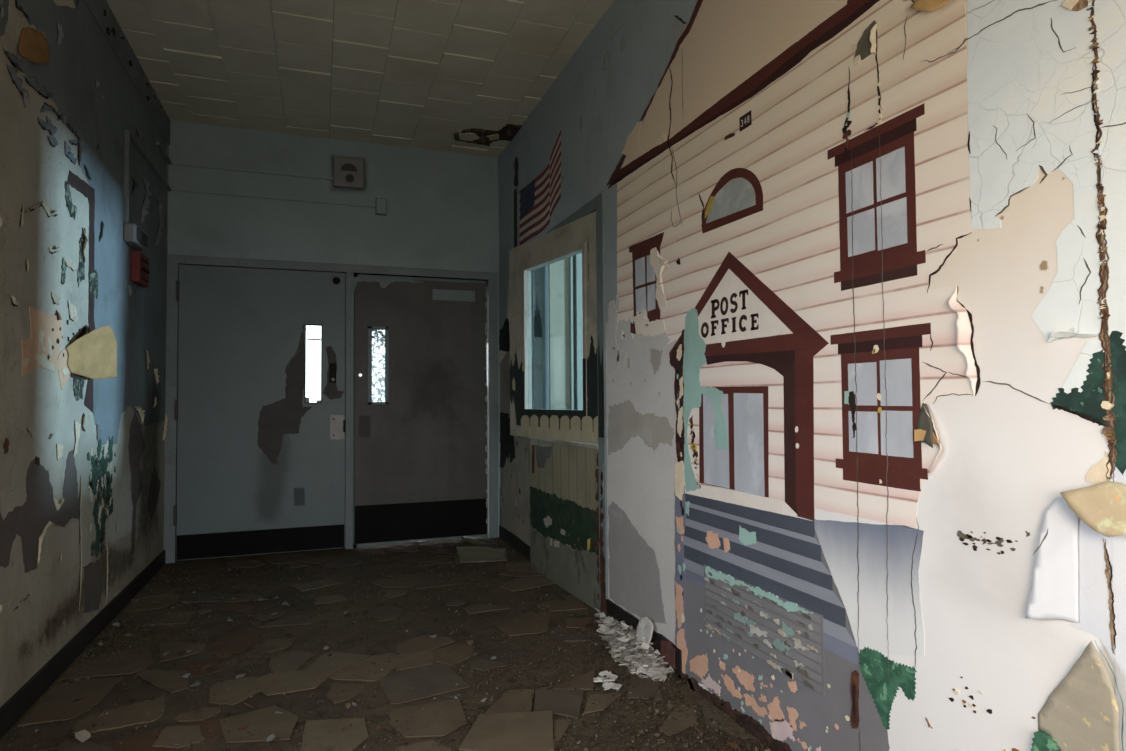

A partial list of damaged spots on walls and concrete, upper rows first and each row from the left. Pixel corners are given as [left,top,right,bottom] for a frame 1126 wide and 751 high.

peeling [0,0,91,180]
peeling [11,291,117,390]
peeling [257,324,312,464]
peeling [322,346,344,400]
spalling [844,391,856,438]
crack [842,0,1126,683]
peeling [0,350,169,614]
peeling [608,247,831,751]
spalling [59,653,397,751]
spalling [389,678,663,751]
spalling [949,676,992,714]
peeling [1004,640,1124,751]